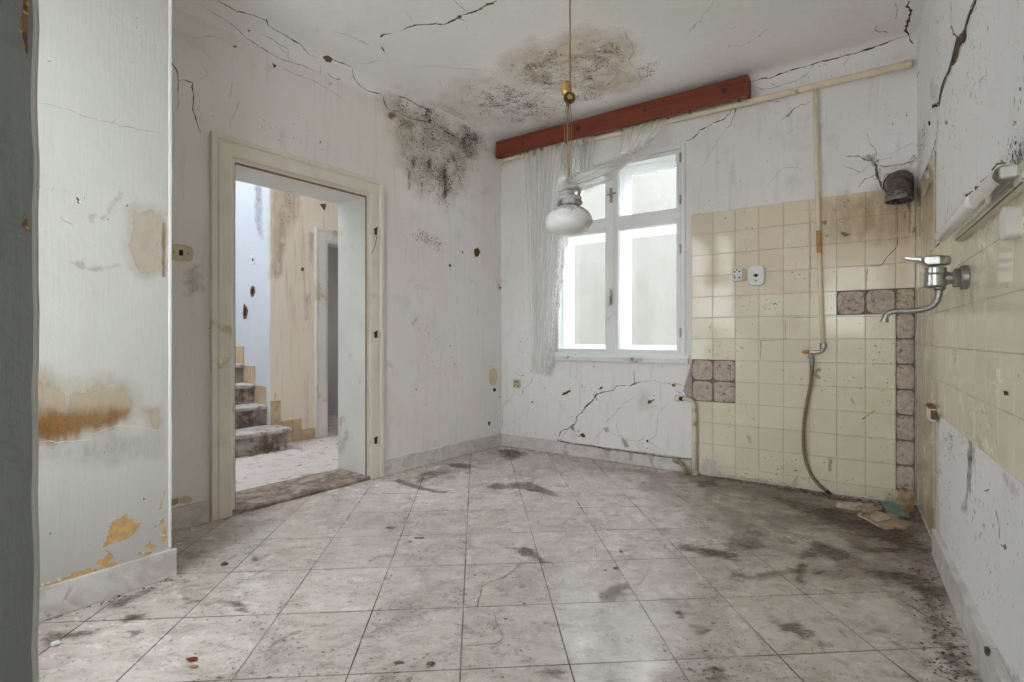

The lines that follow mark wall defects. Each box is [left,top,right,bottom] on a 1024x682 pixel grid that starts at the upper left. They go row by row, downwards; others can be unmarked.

peeling [18,0,31,54]
crack [171,61,207,131]
crack [193,1,496,110]
water stain [460,43,660,124]
water stain [383,96,479,207]
crack [839,0,976,317]
crack [559,378,685,449]
peeling [40,514,142,587]
peeling [138,496,193,556]